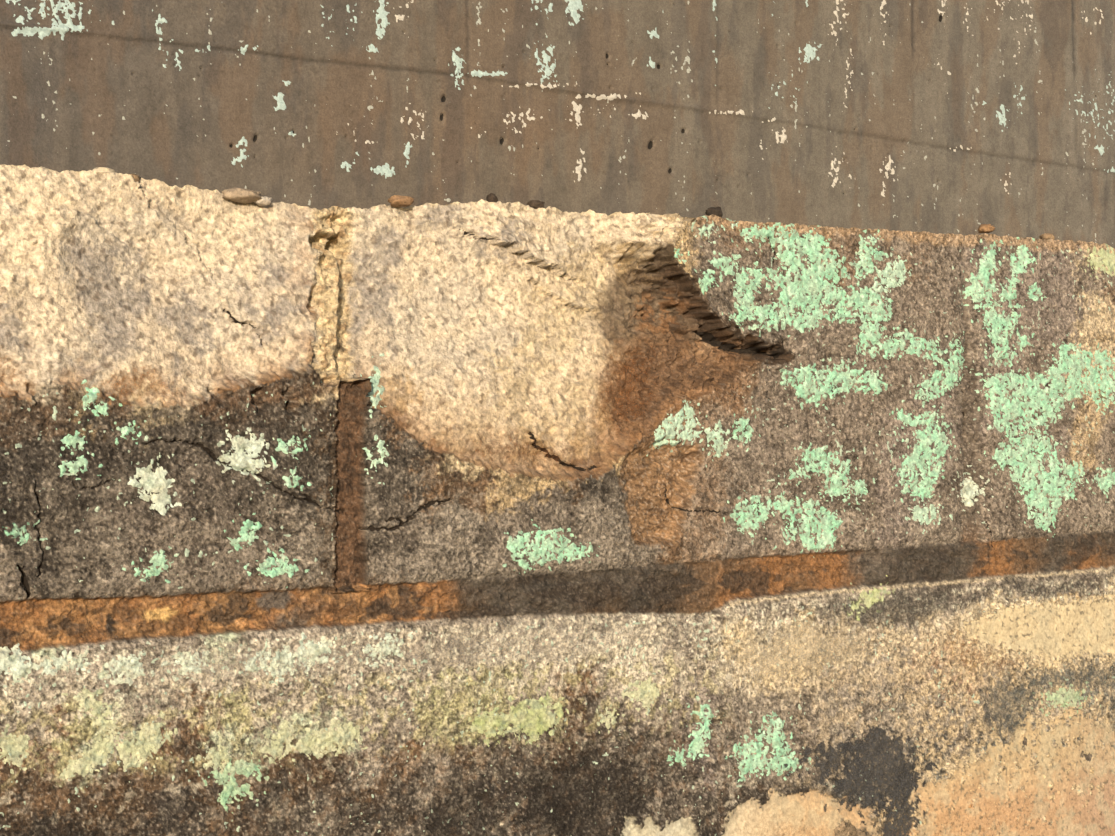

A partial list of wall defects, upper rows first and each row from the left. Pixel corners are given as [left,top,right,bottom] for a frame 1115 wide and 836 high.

spalling [346,199,794,550]
crack [144,438,451,531]
water stain [428,788,497,836]
water stain [520,748,641,836]
water stain [784,719,937,836]